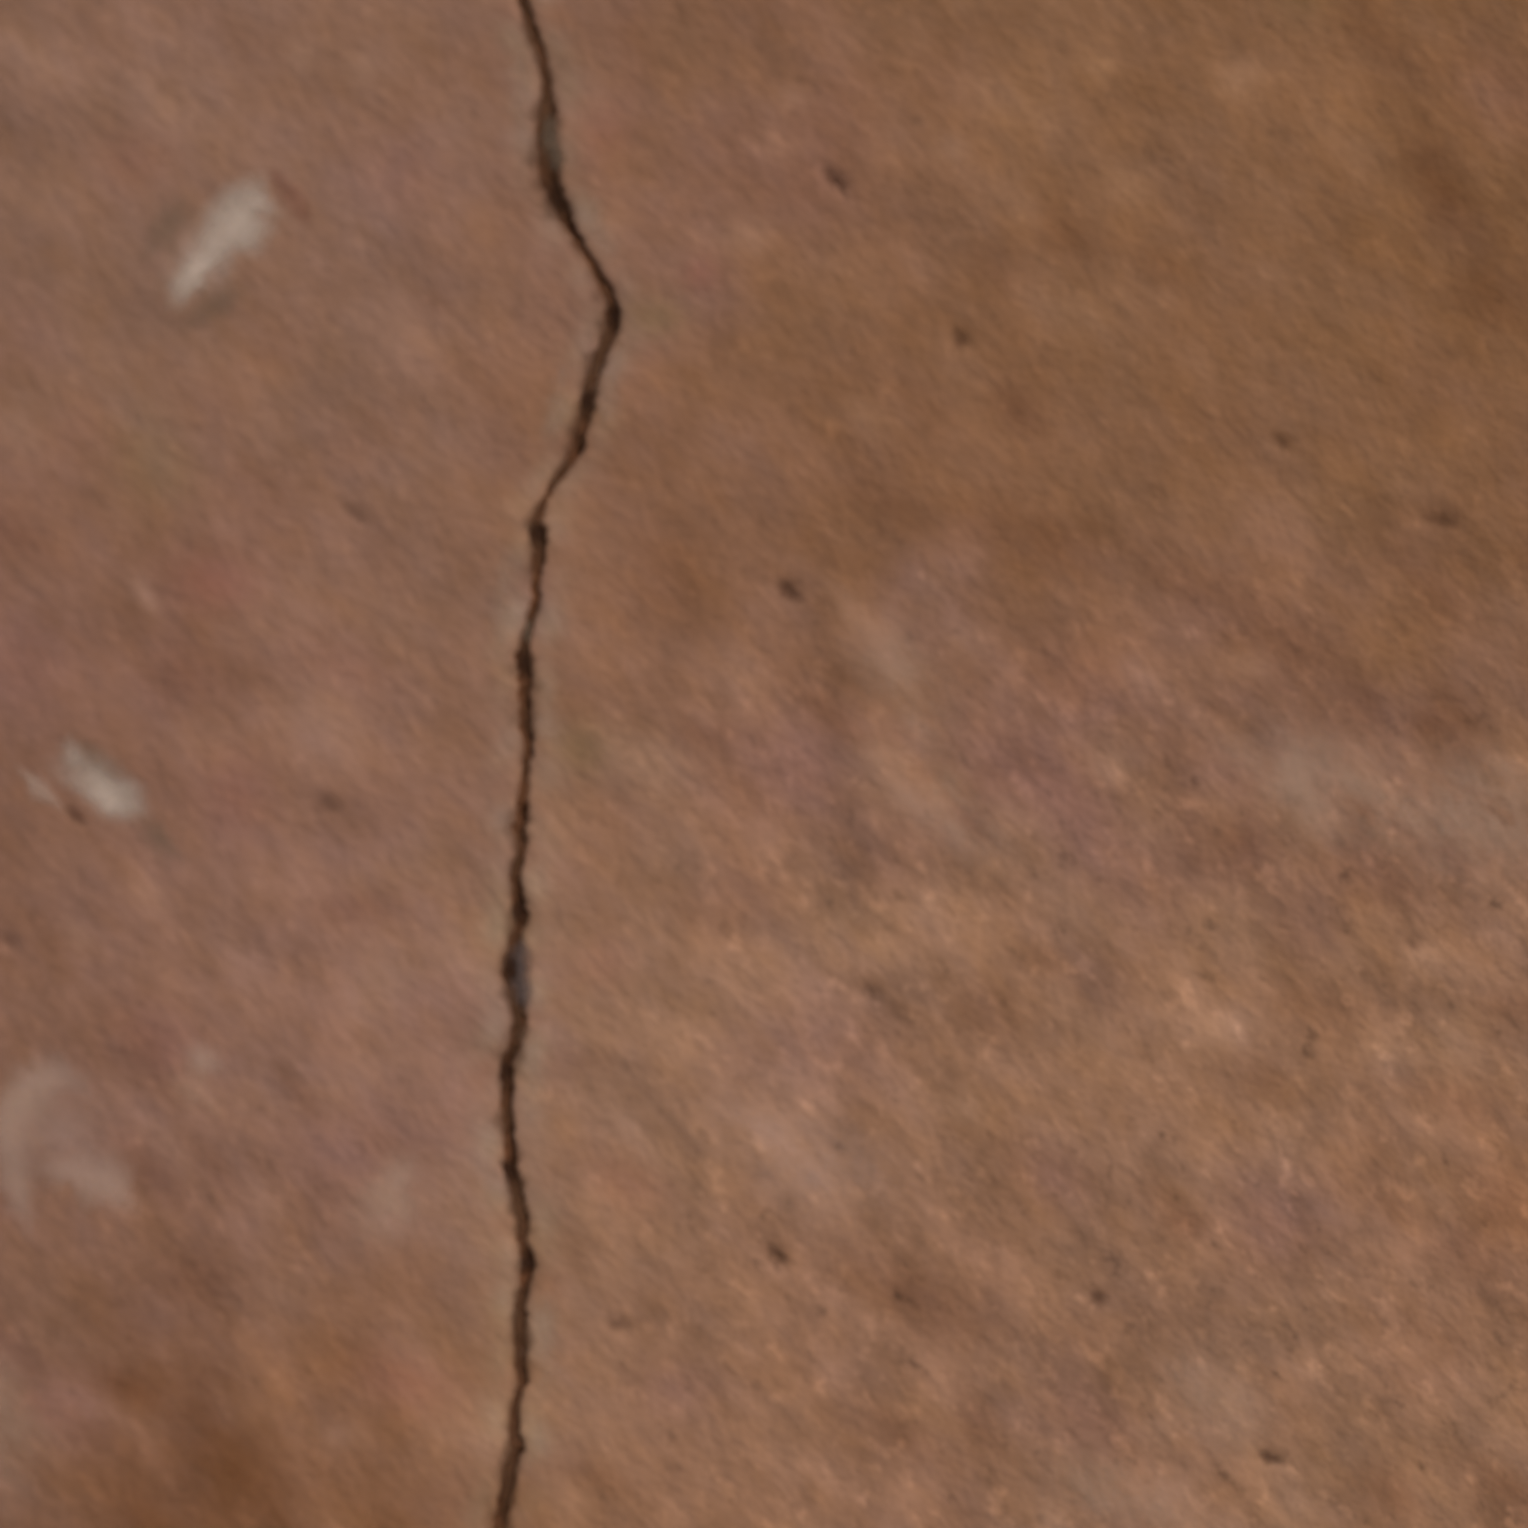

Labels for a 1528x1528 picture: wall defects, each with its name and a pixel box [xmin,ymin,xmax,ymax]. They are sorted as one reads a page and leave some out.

crack [493,0,620,1528]